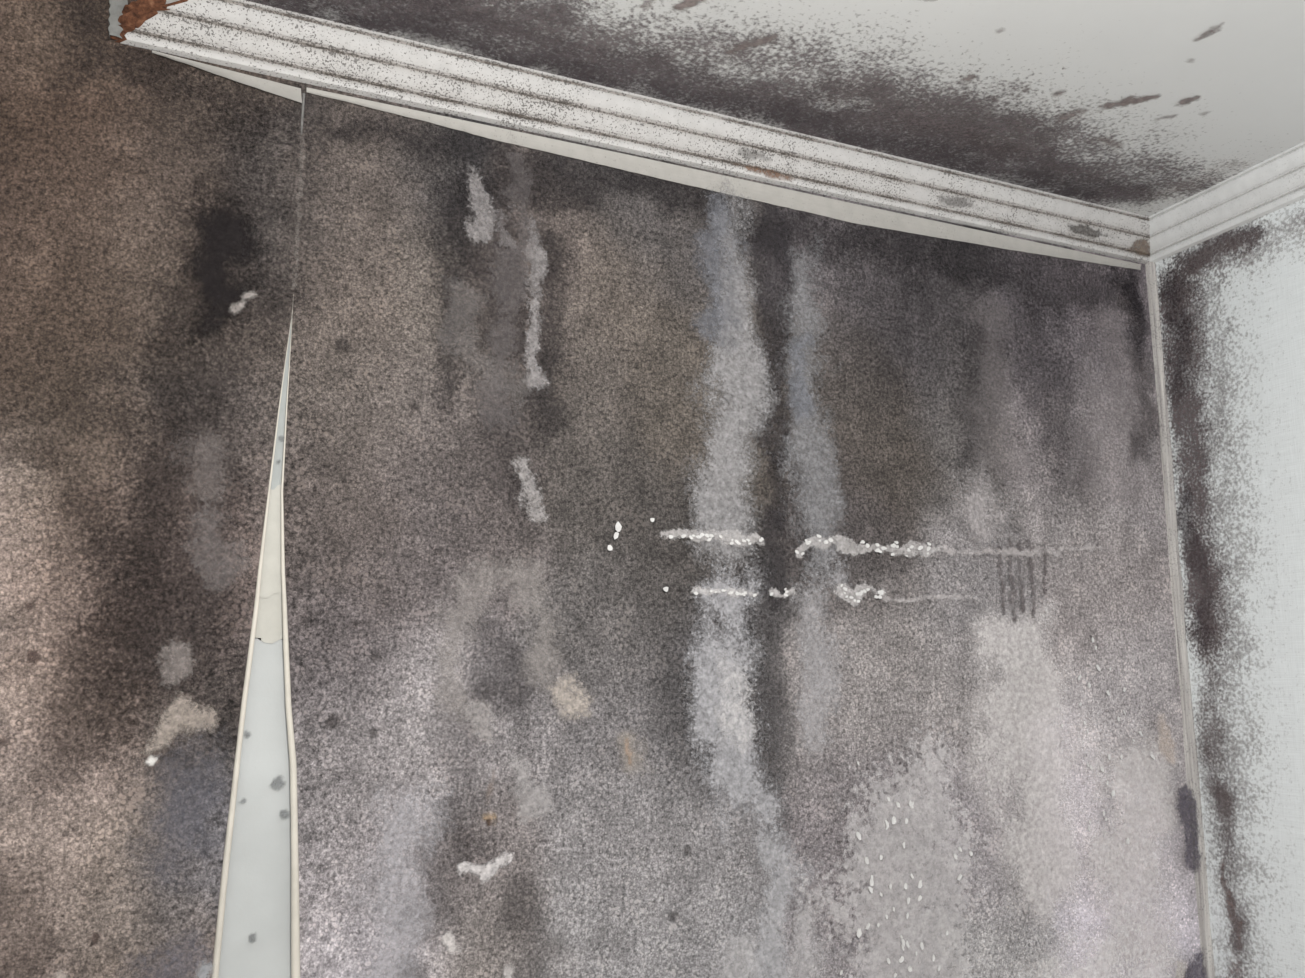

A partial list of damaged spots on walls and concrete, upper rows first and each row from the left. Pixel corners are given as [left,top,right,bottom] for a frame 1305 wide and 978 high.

water stain [186,206,261,335]
water stain [442,147,1266,978]
water stain [150,643,191,682]
water stain [146,698,216,766]